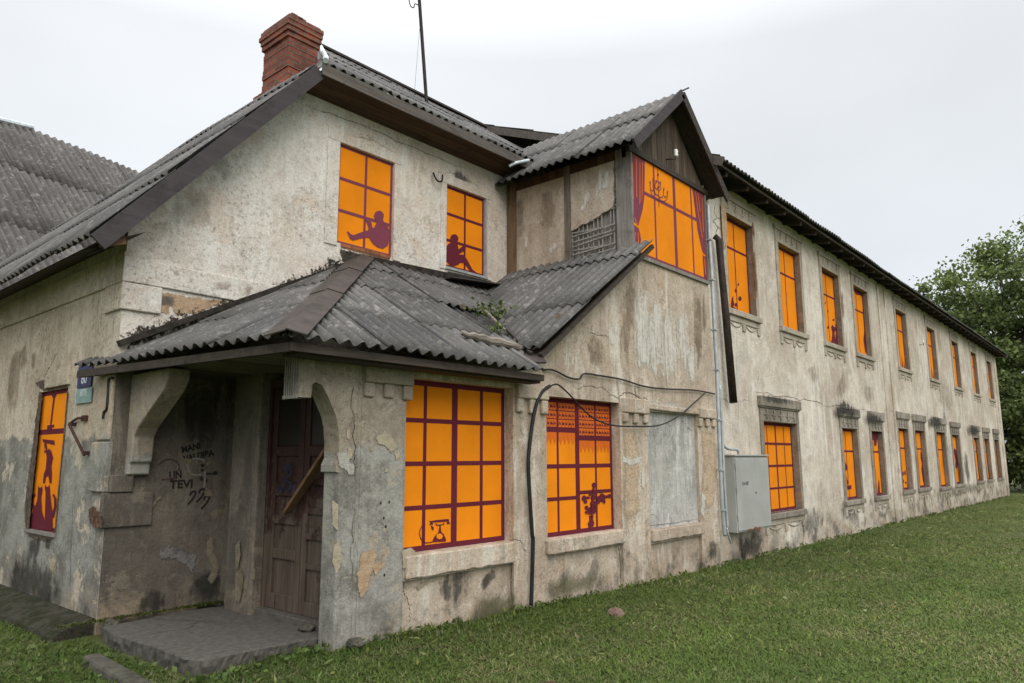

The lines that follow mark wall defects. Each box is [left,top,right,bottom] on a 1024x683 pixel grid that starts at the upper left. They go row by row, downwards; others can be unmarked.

spalling [120,292,232,349]
damp [631,291,696,383]
damp [836,399,855,417]
spalling [338,429,354,475]
damp [11,539,56,602]
spalling [88,506,104,529]
peeling [159,536,219,584]
peeling [332,501,343,575]
peeling [356,550,382,601]
damp [443,572,465,601]
damp [739,535,762,560]